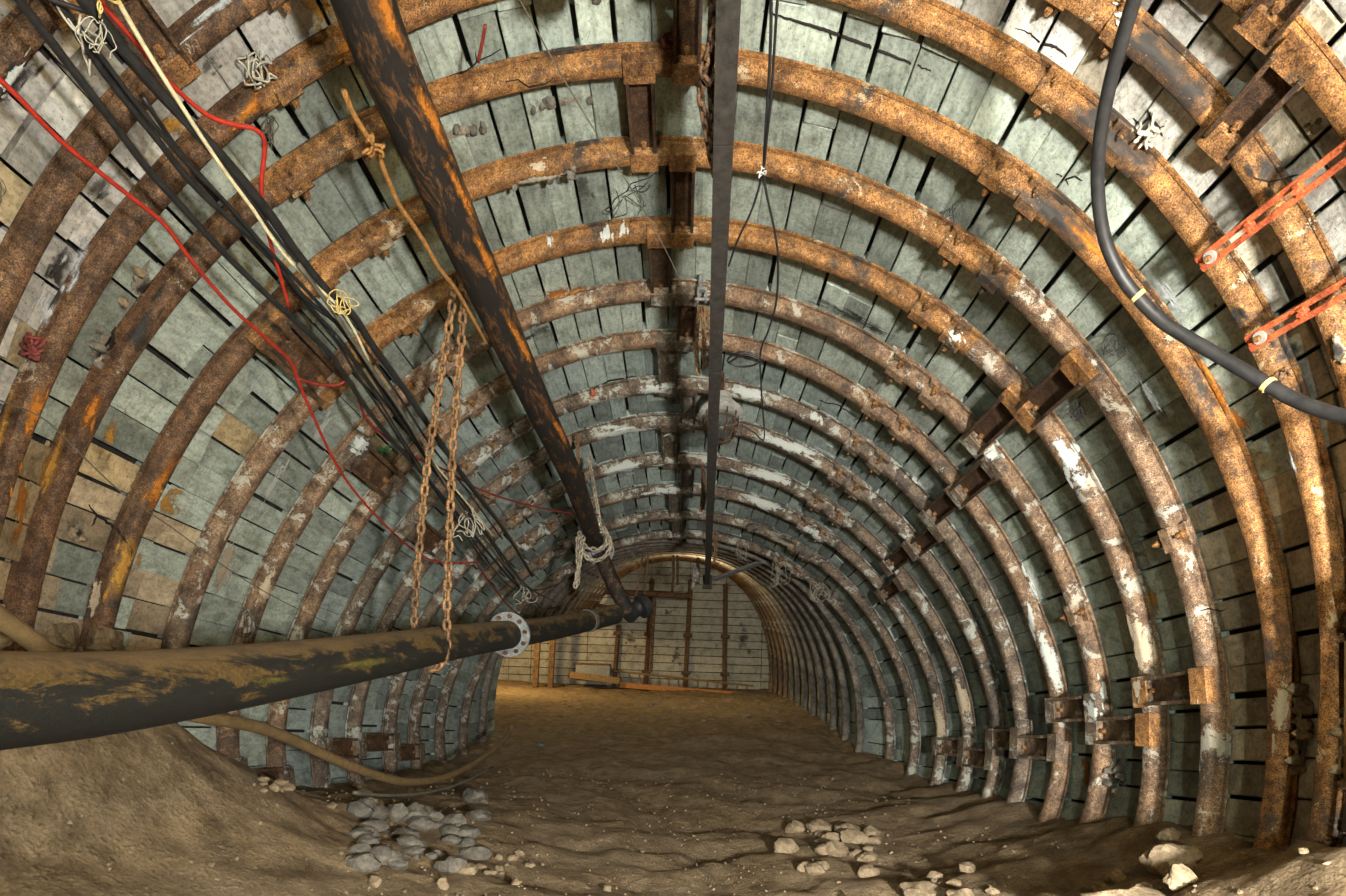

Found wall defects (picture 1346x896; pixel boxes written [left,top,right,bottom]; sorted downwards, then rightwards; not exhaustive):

corrosion [377,0,403,46]
corrosion [418,88,445,143]
corrosion [446,157,472,215]
corrosion [474,238,496,280]
corrosion [1072,227,1104,260]
corrosion [507,321,532,364]
corrosion [25,390,49,434]
corrosion [83,396,126,458]
corrosion [1197,362,1250,436]
corrosion [10,433,65,543]
corrosion [143,455,183,515]
corrosion [103,543,141,601]